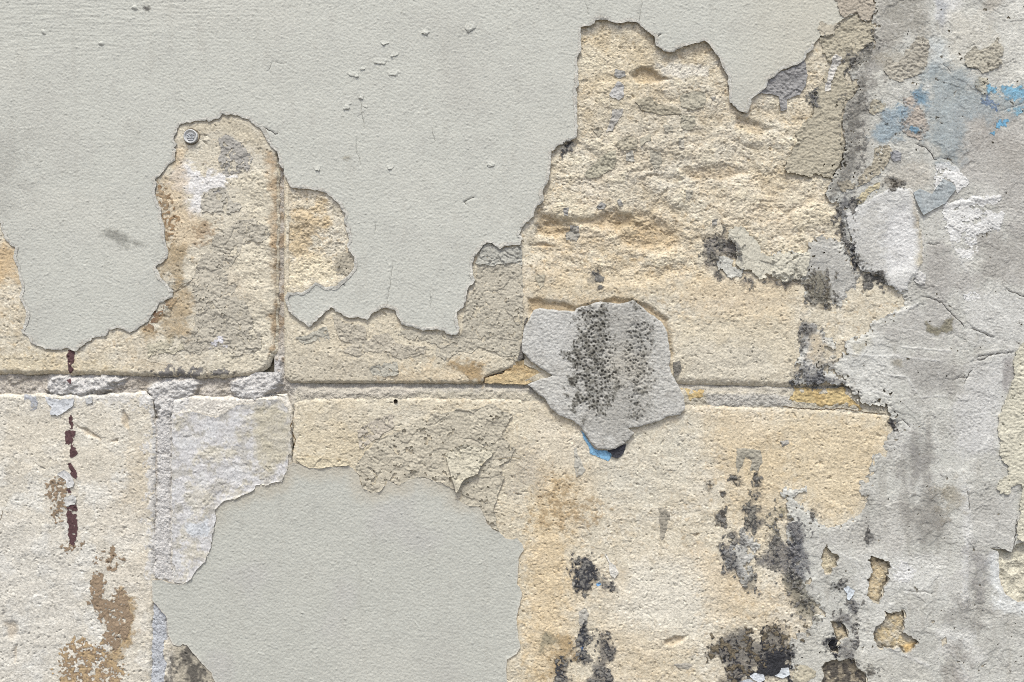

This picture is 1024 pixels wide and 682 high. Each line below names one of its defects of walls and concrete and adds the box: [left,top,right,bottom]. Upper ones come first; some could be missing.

spalling [0,16,844,384]
peeling [57,470,77,506]
flaking render [294,402,538,531]
damp [566,552,615,598]
damp [705,472,880,682]
flaking render [844,556,918,653]
flaking render [163,639,215,682]